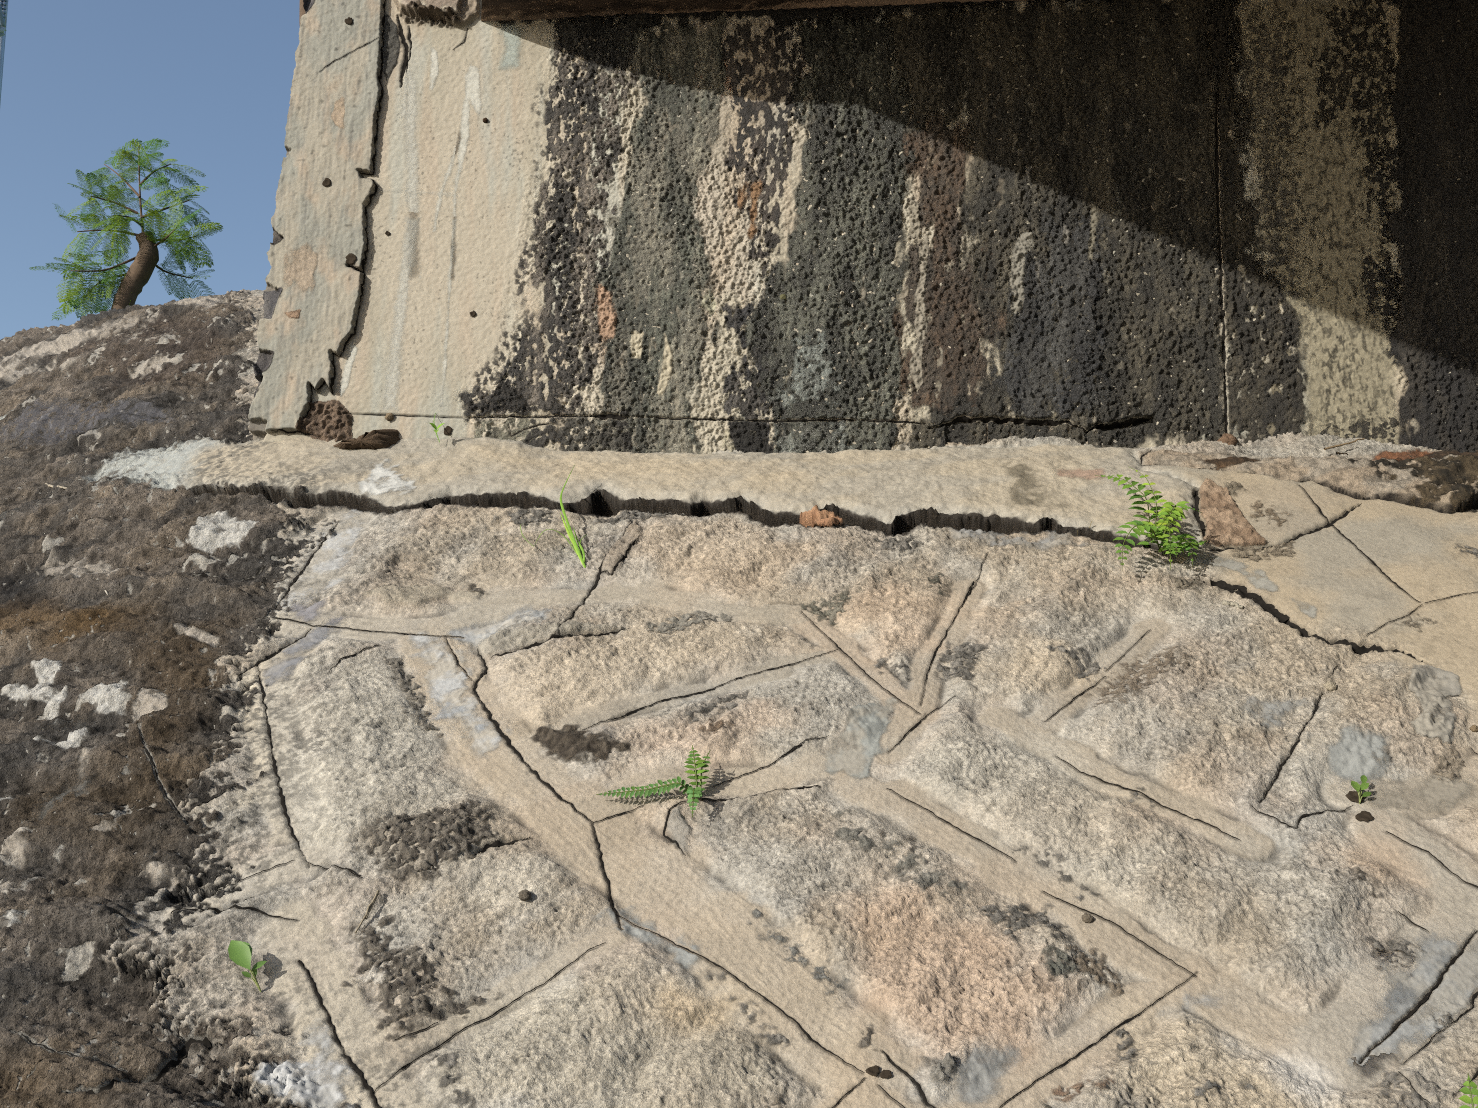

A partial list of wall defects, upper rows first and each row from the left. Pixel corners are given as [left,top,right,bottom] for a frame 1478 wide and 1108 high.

crack [319,17,412,85]
spalling [413,0,457,24]
leakage [385,0,1075,454]
leakage [989,202,1116,419]
leakage [1205,0,1478,470]
crack [138,724,190,826]
crack [171,414,1478,1108]